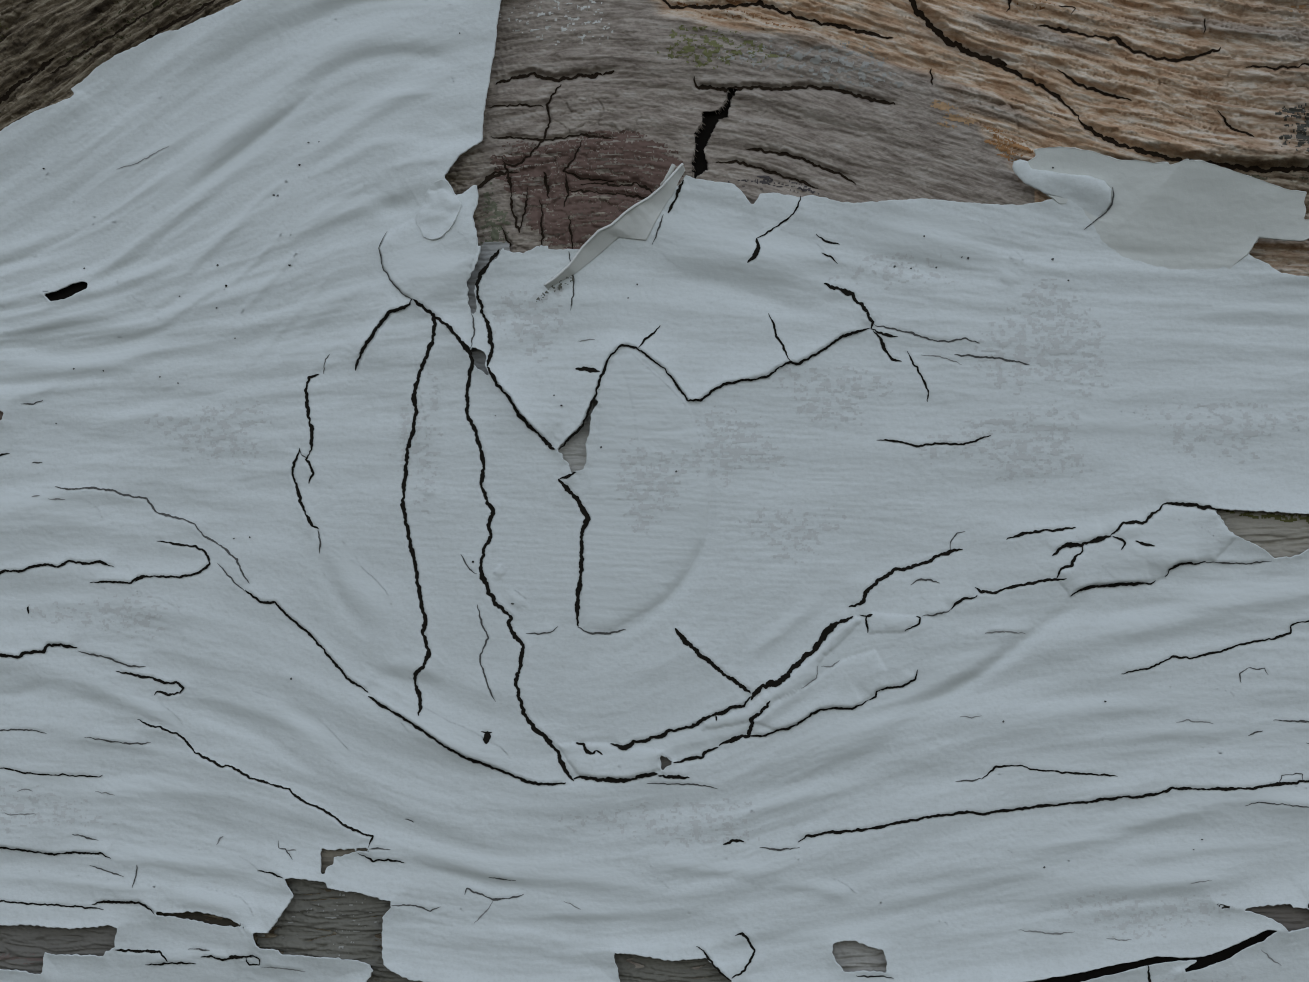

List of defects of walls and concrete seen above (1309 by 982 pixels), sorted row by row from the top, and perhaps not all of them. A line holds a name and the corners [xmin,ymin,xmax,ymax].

peeling [415,179,462,240]
peeling [467,242,510,314]
crack [0,70,1270,789]
crack [1122,620,1309,682]
crack [0,643,404,863]
crack [723,719,1309,851]
crack [0,834,154,914]
crack [258,843,295,878]
peeling [158,911,241,927]
peeling [257,878,422,982]
peeling [832,941,887,973]
peeling [1082,927,1309,982]